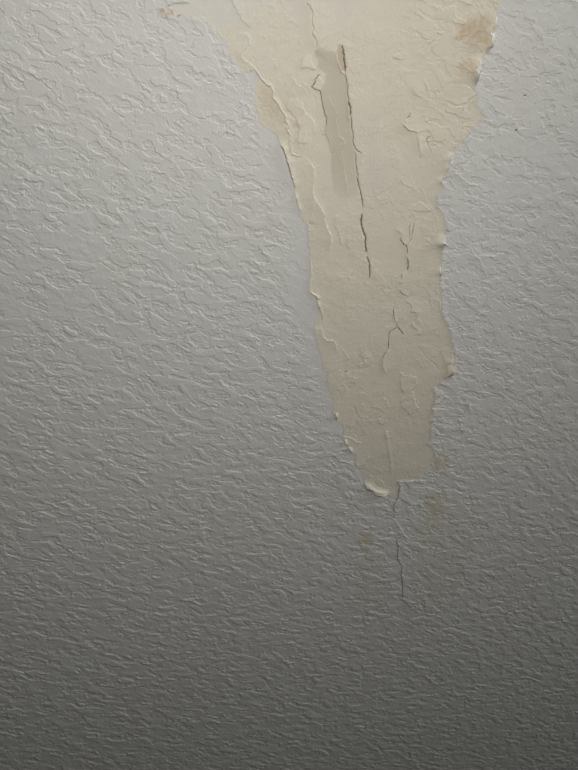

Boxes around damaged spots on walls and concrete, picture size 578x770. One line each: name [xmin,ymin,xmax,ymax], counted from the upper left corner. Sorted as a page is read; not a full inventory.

peeling [161,0,529,499]